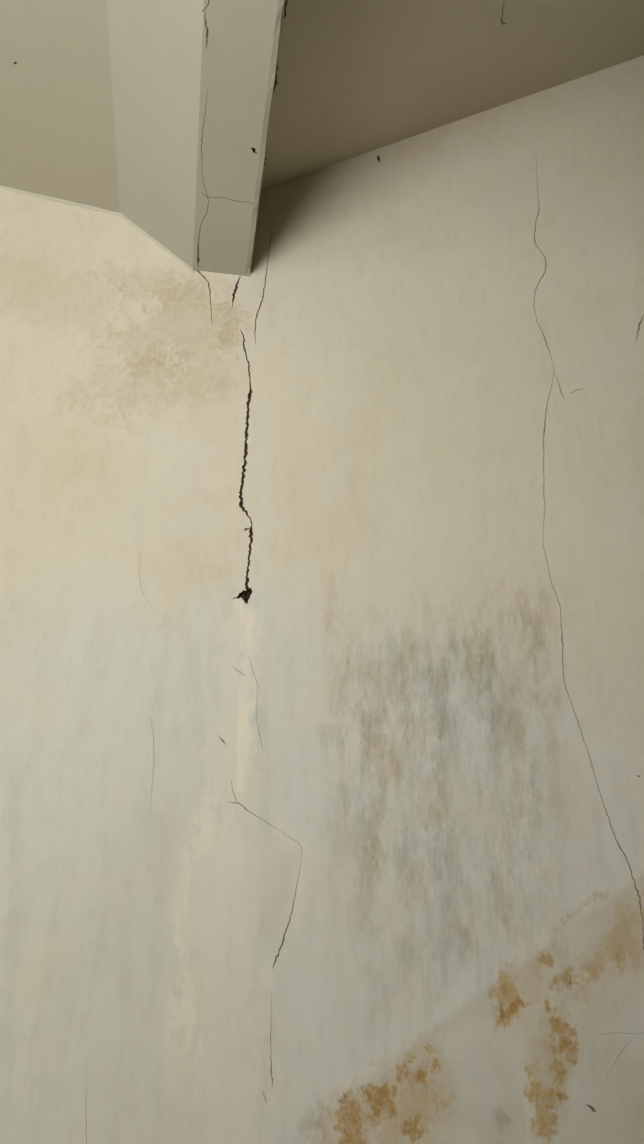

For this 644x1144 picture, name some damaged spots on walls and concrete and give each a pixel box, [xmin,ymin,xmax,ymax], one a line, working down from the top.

crack [202,0,210,47]
crack [197,90,273,604]
crack [533,158,644,950]
crack [228,778,302,1102]